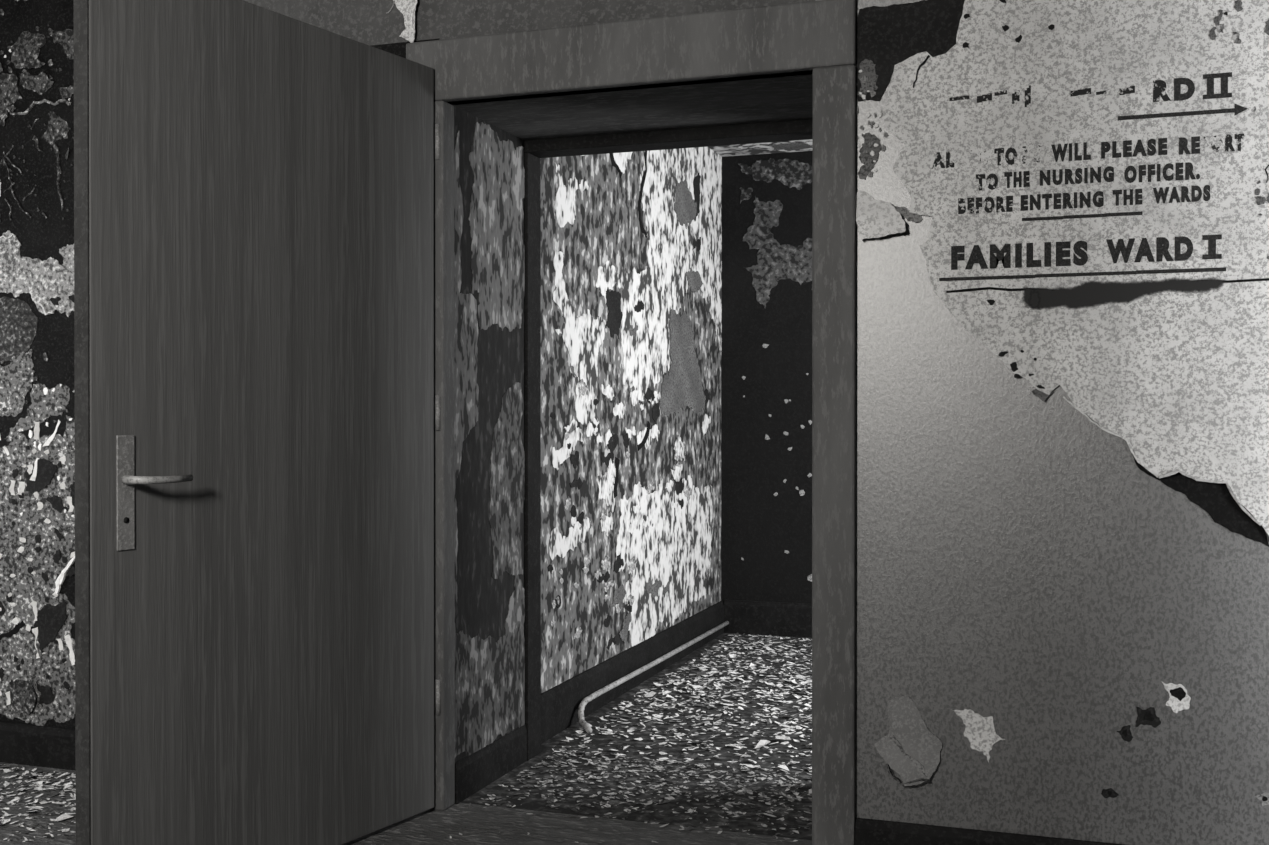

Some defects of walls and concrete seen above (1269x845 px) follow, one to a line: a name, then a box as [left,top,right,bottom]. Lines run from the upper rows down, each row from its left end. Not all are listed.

peeling [0,18,74,117]
peeling [386,0,418,43]
flaking render [0,231,74,317]
flaking render [454,122,525,611]
flaking render [547,147,722,650]
flaking render [737,139,812,308]
crack [946,286,1053,294]
flaking render [856,0,1269,547]
crack [1223,276,1269,284]
flaking render [0,349,75,726]
flaking render [455,382,525,757]
flaking render [953,709,1005,762]